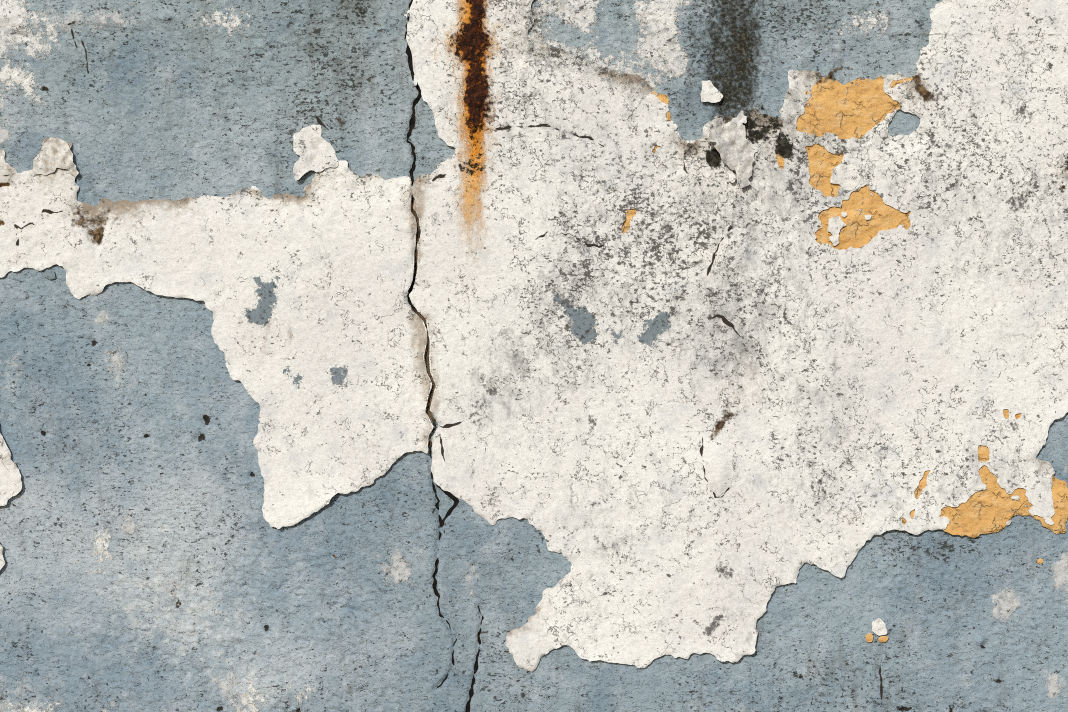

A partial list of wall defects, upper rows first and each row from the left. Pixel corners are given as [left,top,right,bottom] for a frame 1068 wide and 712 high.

corrosion [447,0,499,225]
water stain [701,0,795,161]
peeling [0,124,434,529]
crack [404,0,484,712]
peeling [404,0,1068,672]